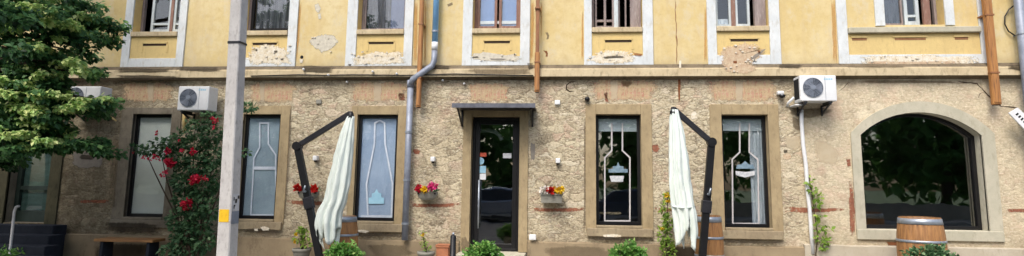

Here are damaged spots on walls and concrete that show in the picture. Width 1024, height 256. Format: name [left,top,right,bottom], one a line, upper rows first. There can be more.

peeling [310,34,338,52]
flaking render [246,44,303,66]
flaking render [349,51,406,66]
flaking render [587,50,642,64]
flaking render [707,42,776,102]